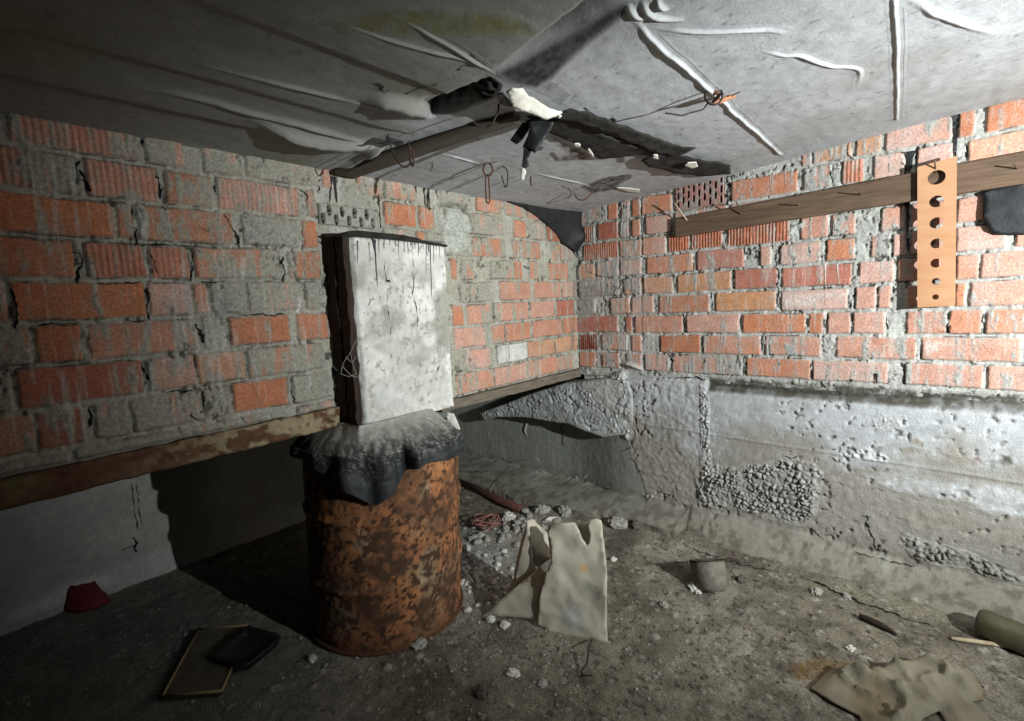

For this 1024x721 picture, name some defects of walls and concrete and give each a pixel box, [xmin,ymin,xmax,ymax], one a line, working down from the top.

peeling [506,87,562,120]
crack [75,161,92,192]
crack [73,175,240,322]
crack [10,288,77,329]
crack [195,323,205,343]
crack [239,311,285,319]
crack [141,363,205,420]
spalling [694,374,824,528]
crack [121,484,144,552]
crack [856,515,915,567]
spalling [897,531,1024,586]
crack [809,579,931,626]